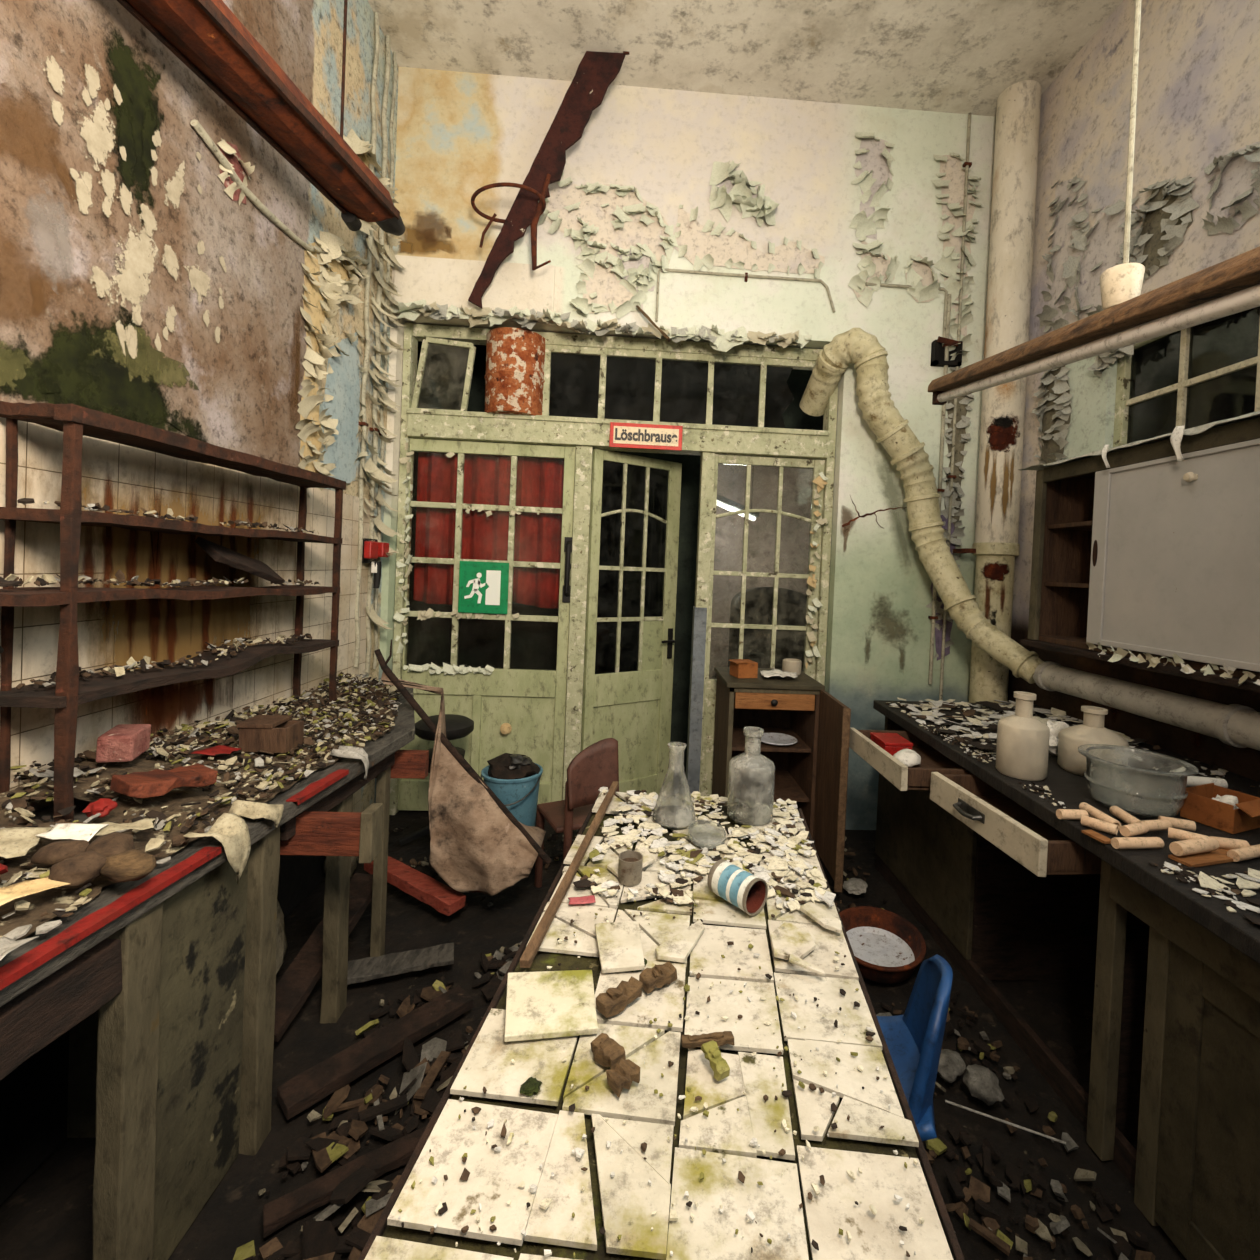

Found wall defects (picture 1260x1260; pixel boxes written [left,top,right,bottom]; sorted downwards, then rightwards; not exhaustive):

leakage [0,84,78,320]
peeling [41,56,224,359]
leakage [118,97,159,192]
leakage [399,214,454,253]
peeling [848,132,982,372]
peeling [1036,142,1260,333]
leakage [0,313,172,426]
peeling [296,160,828,676]
rust [984,415,1021,518]
rust [78,477,275,670]
rust [982,561,1010,626]
rust [128,678,233,741]